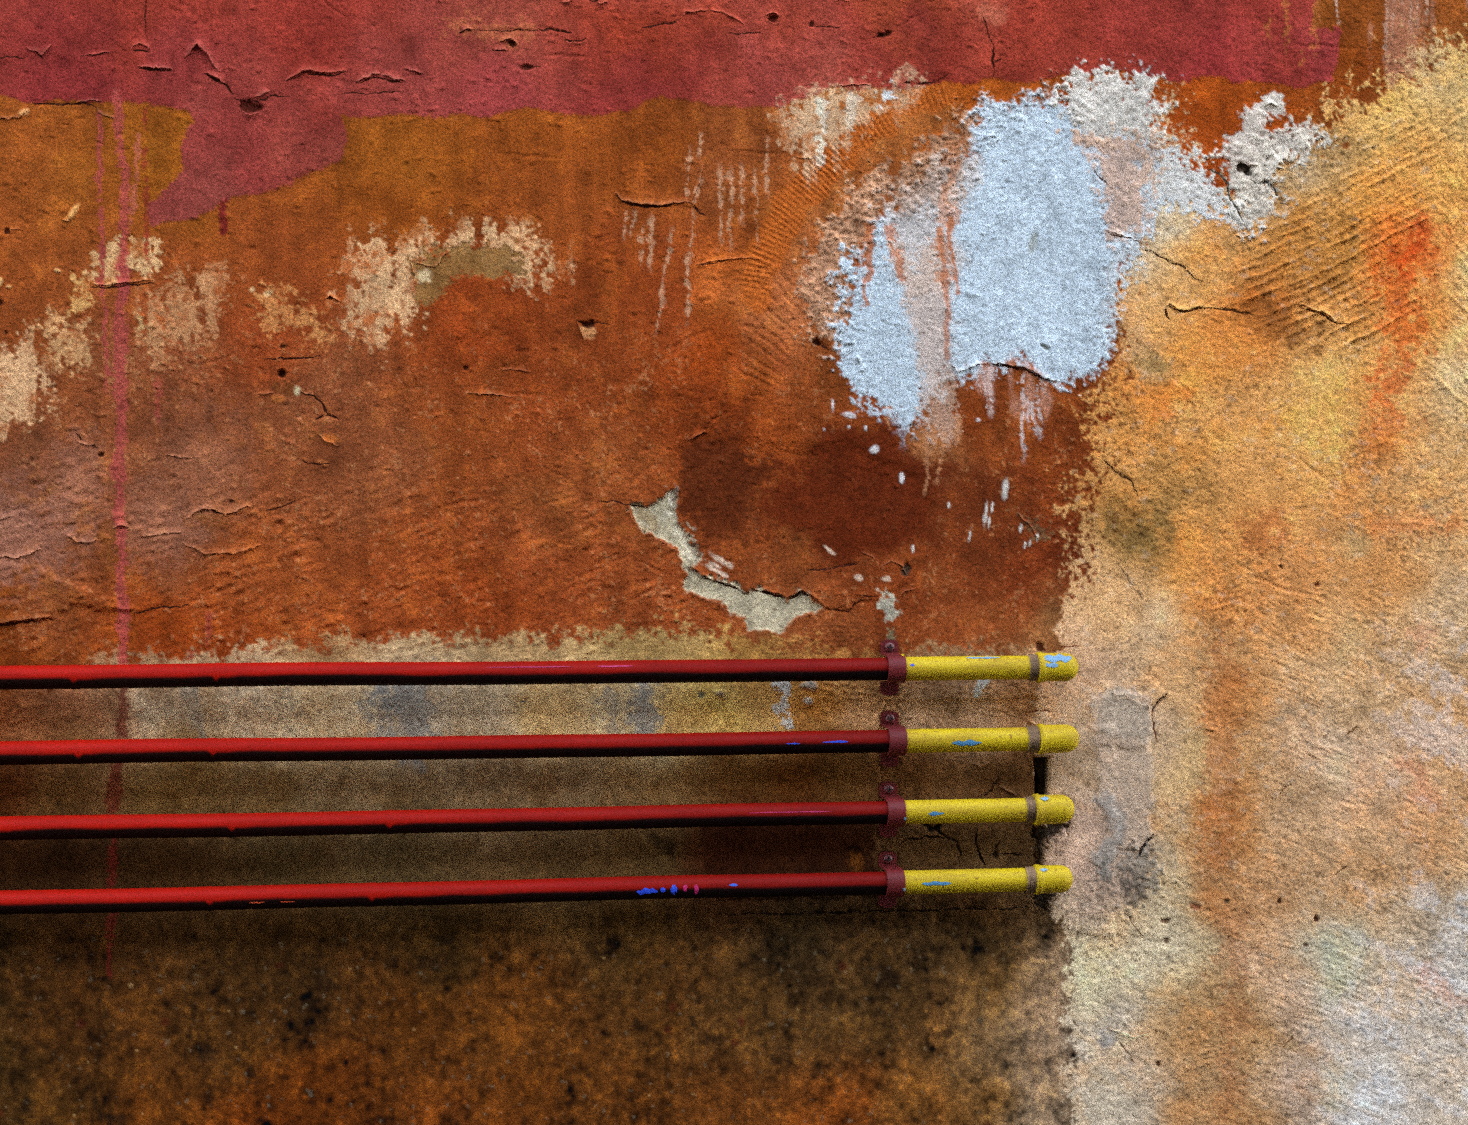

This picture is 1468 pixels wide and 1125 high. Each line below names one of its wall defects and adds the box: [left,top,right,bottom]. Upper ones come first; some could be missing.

peeling [0,96,115,120]
peeling [129,0,424,121]
leakage [0,86,275,665]
flaking render [0,200,580,444]
crack [1299,301,1349,324]
peeling [303,431,339,467]
flaking render [602,485,826,636]